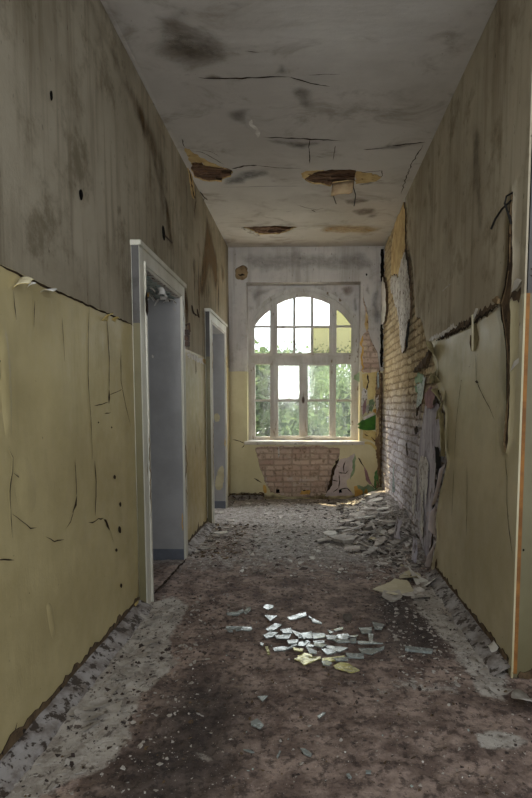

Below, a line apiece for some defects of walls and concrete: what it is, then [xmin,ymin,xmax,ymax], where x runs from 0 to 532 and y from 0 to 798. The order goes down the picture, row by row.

crack [199,74,330,87]
crack [0,555,14,563]
crack [0,265,132,543]
flaking render [213,192,522,673]